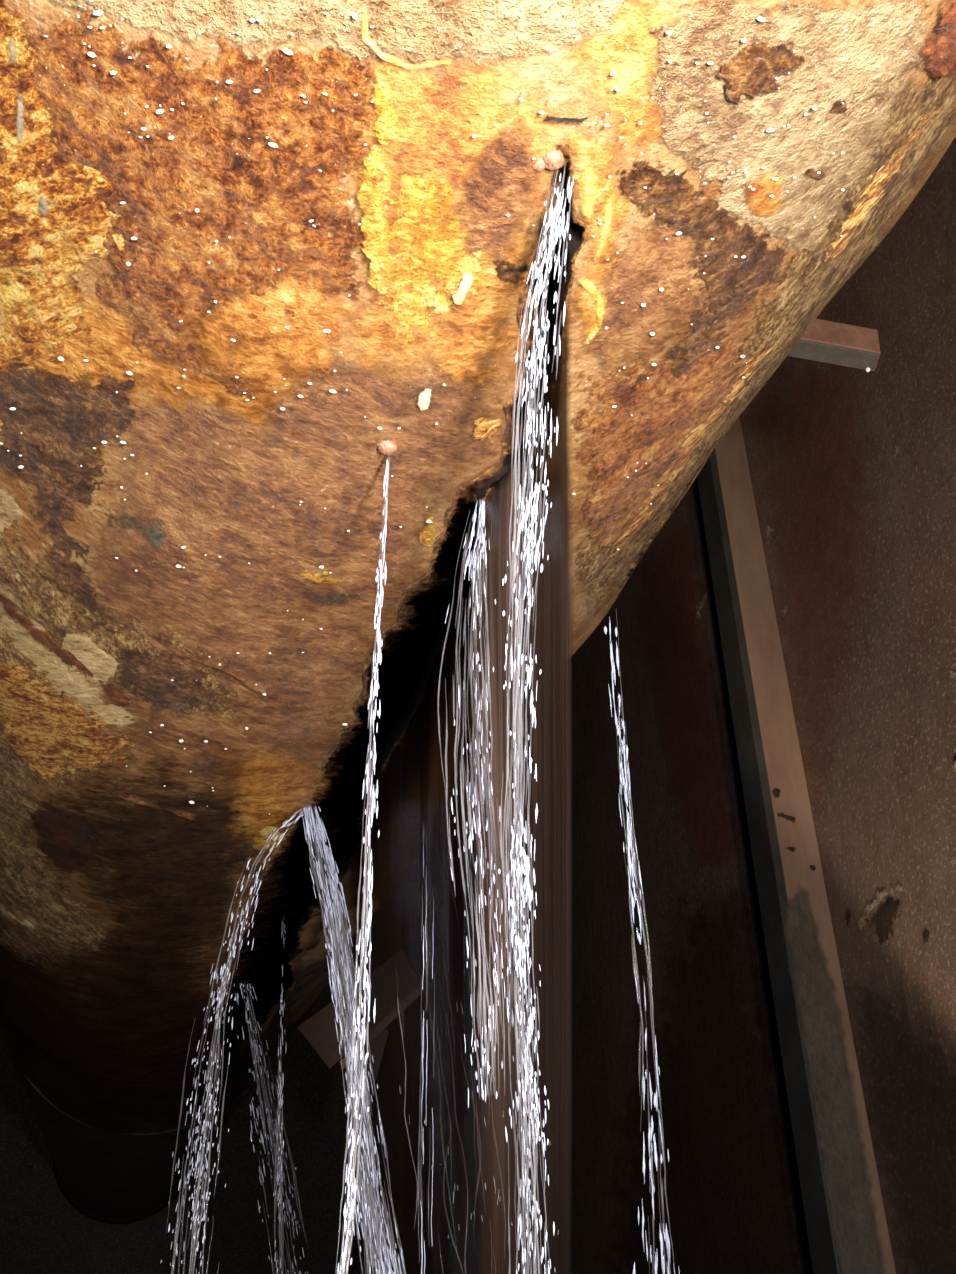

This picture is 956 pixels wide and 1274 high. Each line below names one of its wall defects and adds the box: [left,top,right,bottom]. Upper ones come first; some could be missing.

crack [215,116,590,1043]
rust [0,0,956,974]
spalling [846,884,903,944]